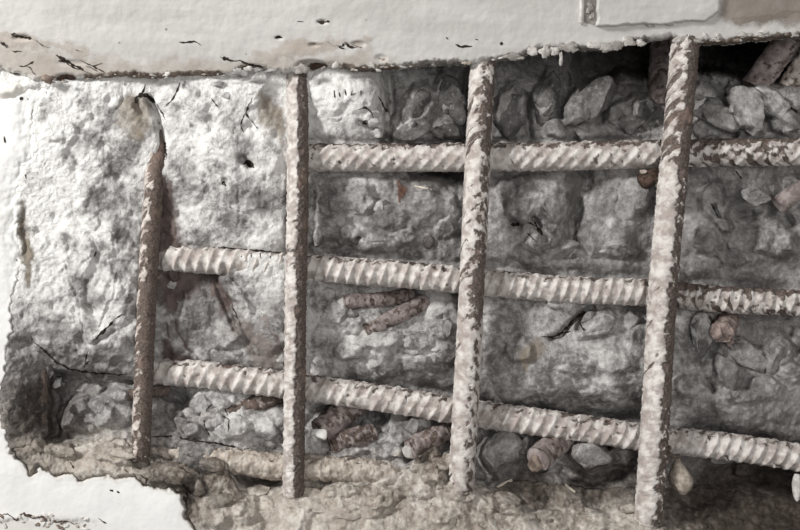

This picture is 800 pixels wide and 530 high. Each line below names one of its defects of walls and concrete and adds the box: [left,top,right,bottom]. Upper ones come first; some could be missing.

spalling [0,58,472,498]
spalling [439,30,800,527]
crack [34,314,128,376]
crack [541,309,593,339]
peeling [0,512,90,530]